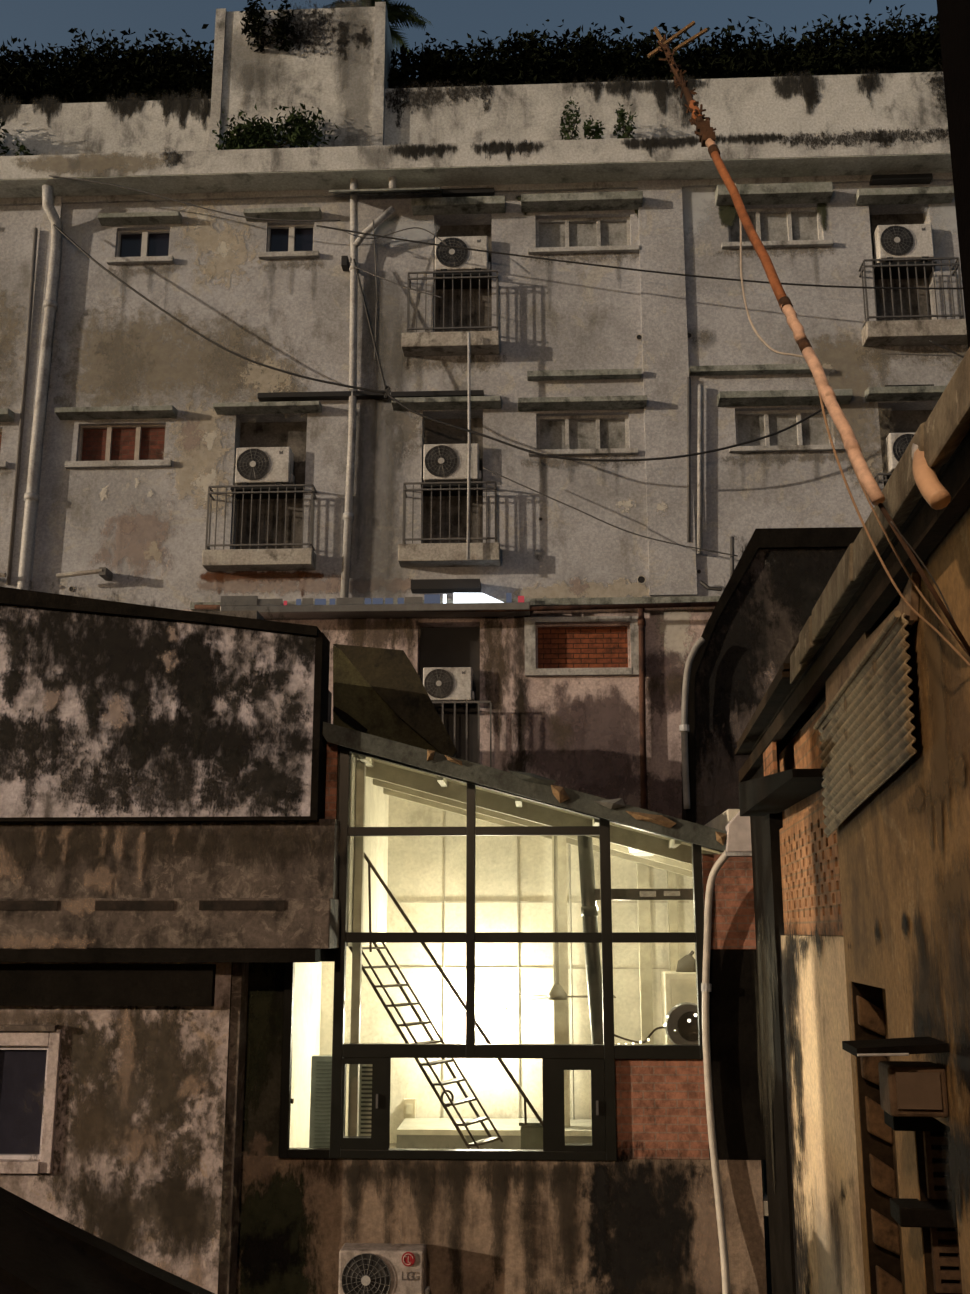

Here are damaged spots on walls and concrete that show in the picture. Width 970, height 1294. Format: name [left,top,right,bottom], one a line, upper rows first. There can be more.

water stain [0,95,62,126]
water stain [106,90,211,129]
water stain [385,80,493,127]
water stain [389,139,544,161]
mould [573,77,710,157]
mould [715,63,949,150]
water stain [479,536,847,822]
water stain [0,593,421,890]
water stain [0,962,714,1294]
water stain [754,912,842,1294]